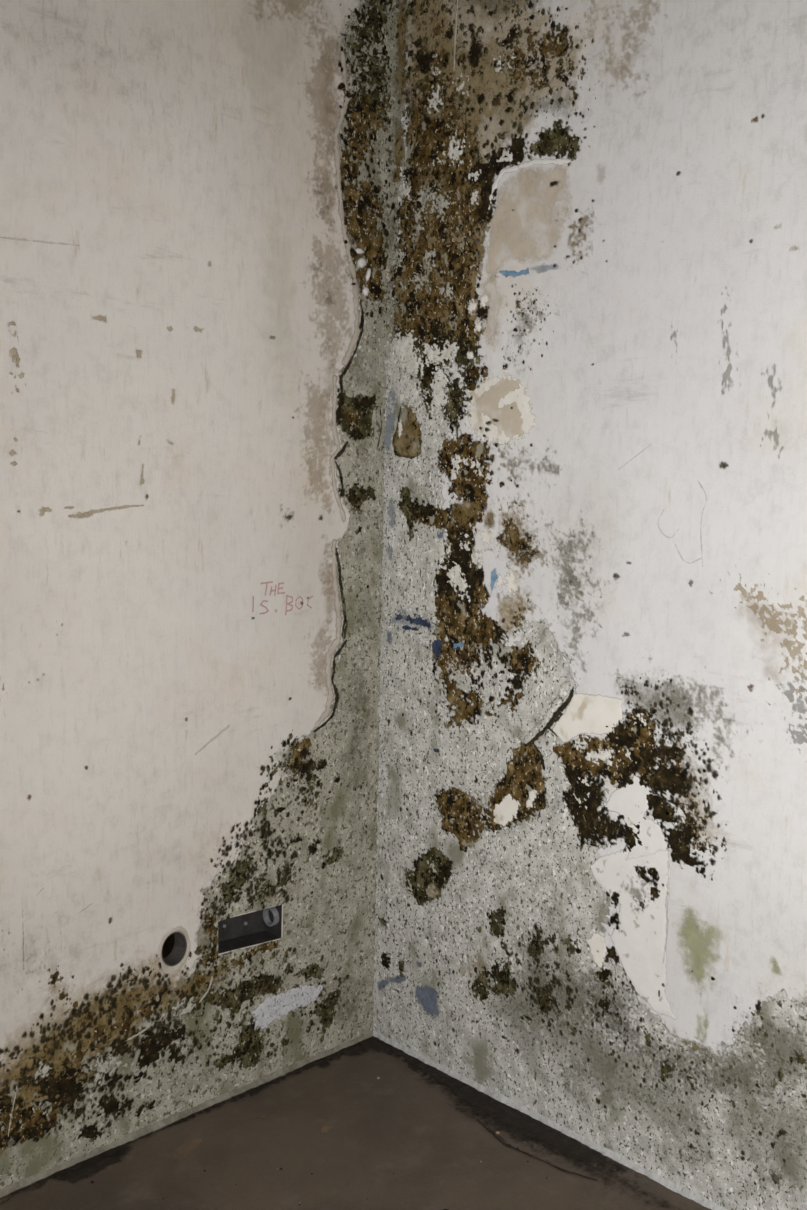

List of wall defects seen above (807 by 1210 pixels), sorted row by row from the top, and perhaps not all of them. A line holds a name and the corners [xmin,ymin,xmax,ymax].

peeling [0,0,393,1189]
water stain [0,730,669,1207]
mould [335,0,601,734]
peeling [484,158,588,342]
mould [398,677,733,906]
peeling [373,341,807,1210]
water stain [468,903,807,1108]
peeling [721,305,732,394]